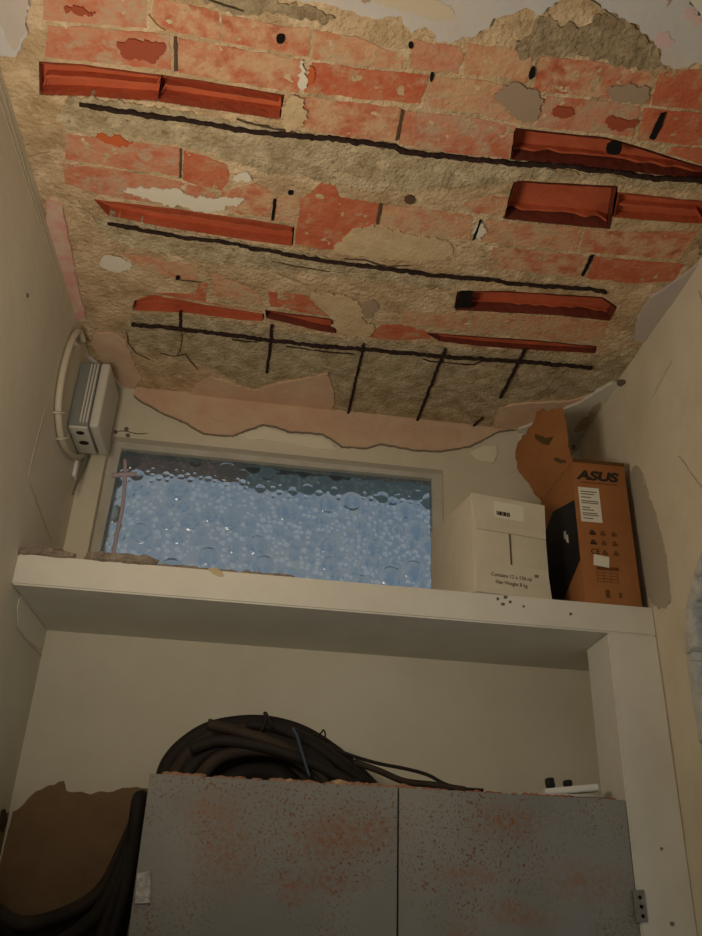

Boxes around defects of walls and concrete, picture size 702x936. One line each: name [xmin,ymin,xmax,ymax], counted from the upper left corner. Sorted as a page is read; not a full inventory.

peeling [0,0,702,408]
flaking render [240,428,336,450]
peeling [0,781,148,915]